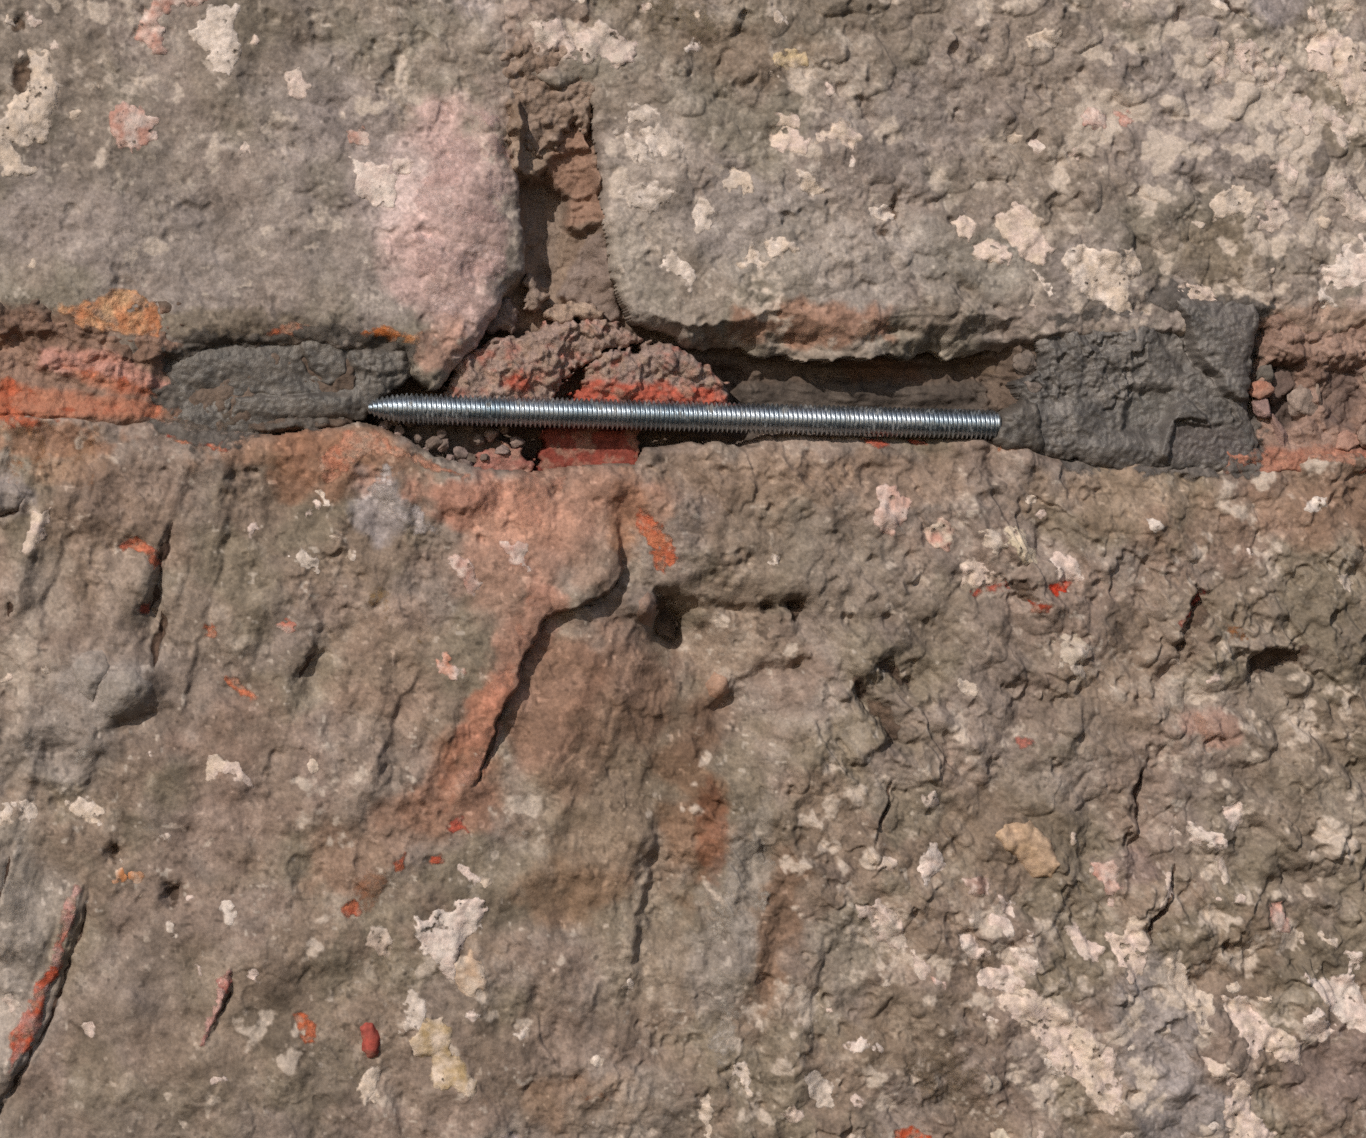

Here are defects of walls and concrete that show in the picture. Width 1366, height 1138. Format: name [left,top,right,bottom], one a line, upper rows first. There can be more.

spalling [361,325,423,345]